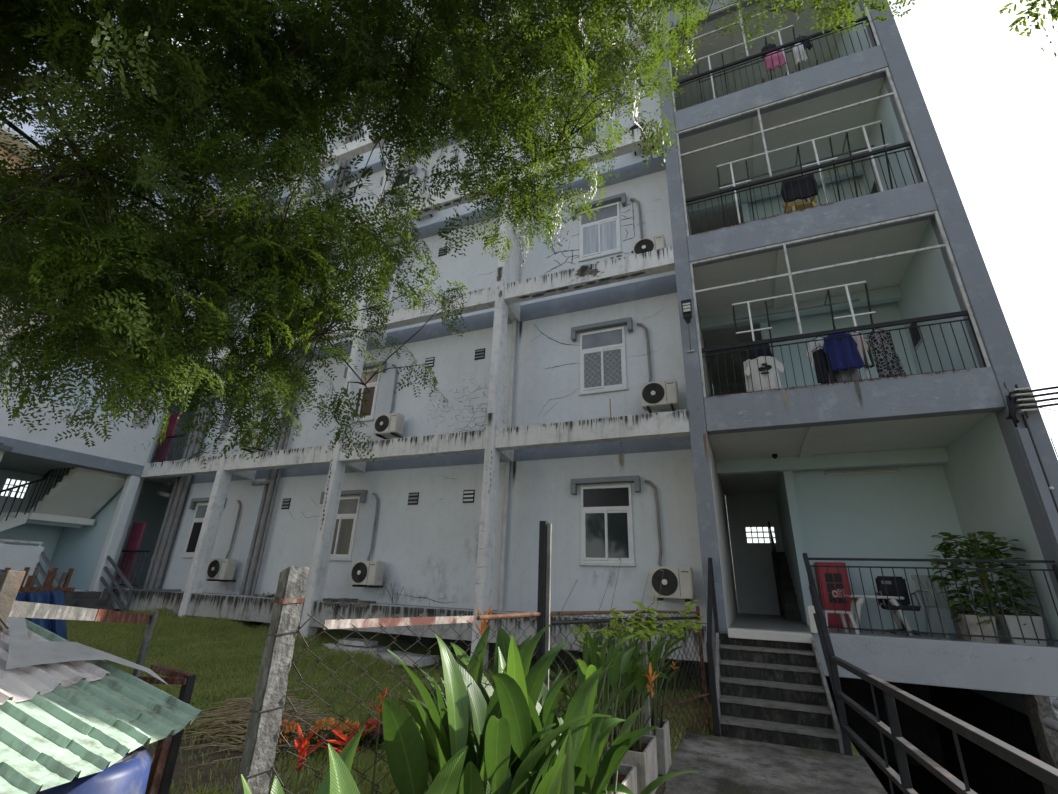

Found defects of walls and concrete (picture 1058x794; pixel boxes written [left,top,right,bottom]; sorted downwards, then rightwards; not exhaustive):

crack [546,234,580,273]
water stain [544,248,668,282]
crack [532,324,580,369]
water stain [151,413,492,468]
crack [425,372,508,432]
water stain [554,413,657,429]
water stain [102,588,273,610]
water stain [303,601,473,625]